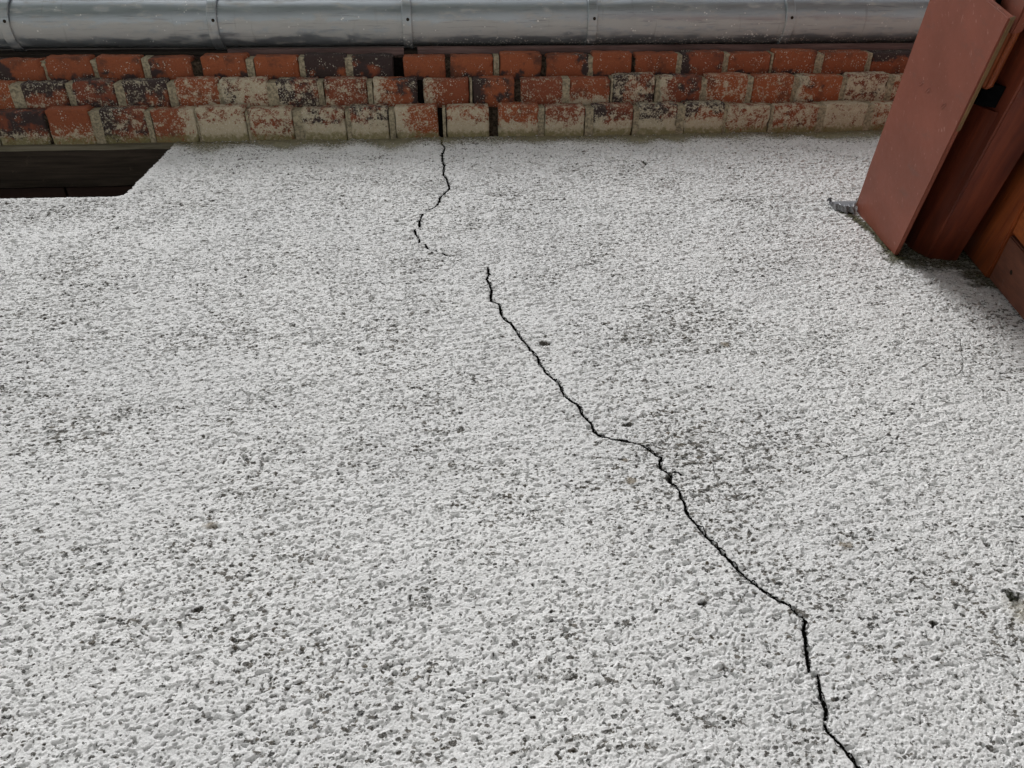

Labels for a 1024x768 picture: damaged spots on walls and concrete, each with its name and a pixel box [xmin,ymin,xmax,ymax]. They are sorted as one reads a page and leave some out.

crack [393,57,861,768]